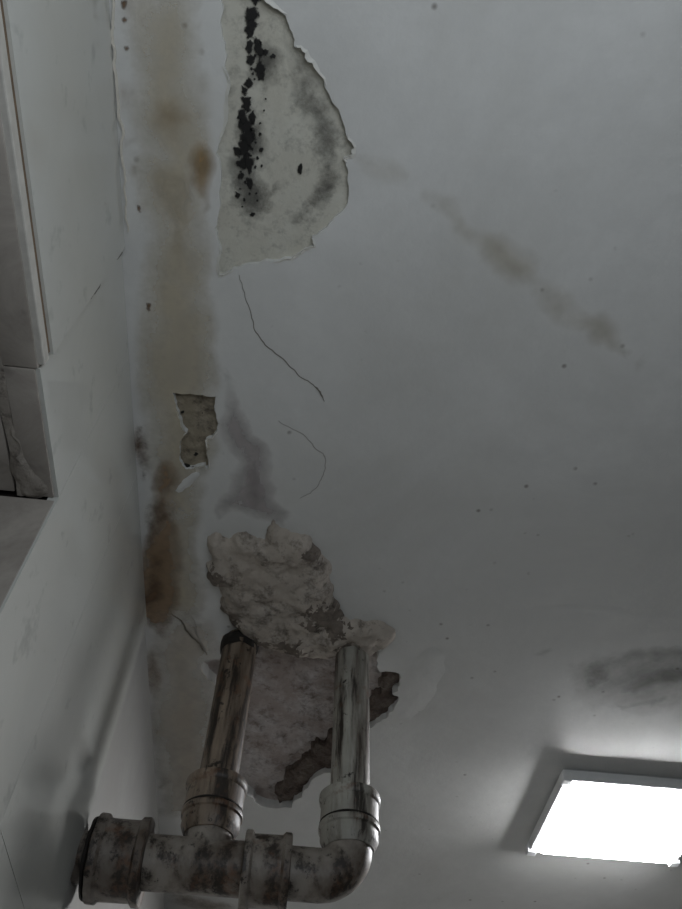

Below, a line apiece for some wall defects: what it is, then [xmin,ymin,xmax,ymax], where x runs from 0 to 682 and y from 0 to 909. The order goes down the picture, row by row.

mould [233,0,276,217]
peeling [216,0,357,277]
leakage [148,11,209,609]
crack [239,276,324,401]
peeling [175,393,218,469]
leakage [162,627,205,810]
flaking render [239,646,335,803]
flaking render [369,652,399,722]